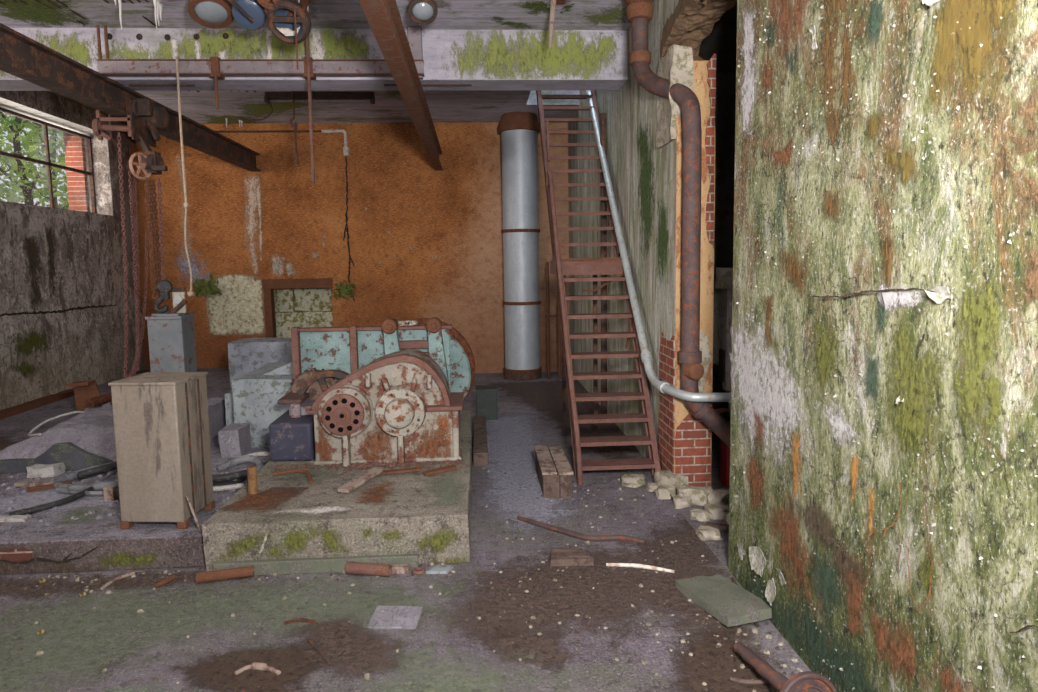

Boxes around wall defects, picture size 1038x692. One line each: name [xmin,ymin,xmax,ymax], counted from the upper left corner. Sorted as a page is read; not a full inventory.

peeling [804,3,836,50]
spalling [660,0,790,248]
peeling [793,76,972,218]
efflorescence [244,176,262,274]
crack [0,305,115,316]
rust [770,433,822,599]
rust [844,552,924,686]